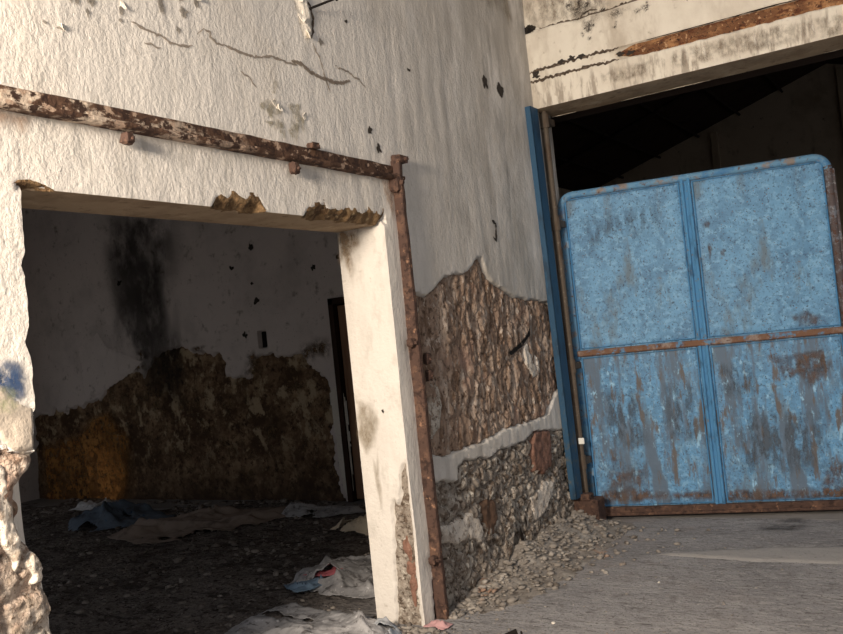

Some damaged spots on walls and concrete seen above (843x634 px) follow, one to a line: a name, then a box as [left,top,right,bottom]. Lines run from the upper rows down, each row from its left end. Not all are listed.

crack [131,21,366,90]
leakage [543,0,605,39]
corrosion [621,0,843,57]
spalling [210,191,266,214]
spalling [302,199,384,226]
flaking render [416,260,557,457]
flaking render [0,331,354,634]
flaking render [395,464,421,625]
flaking render [436,430,574,608]